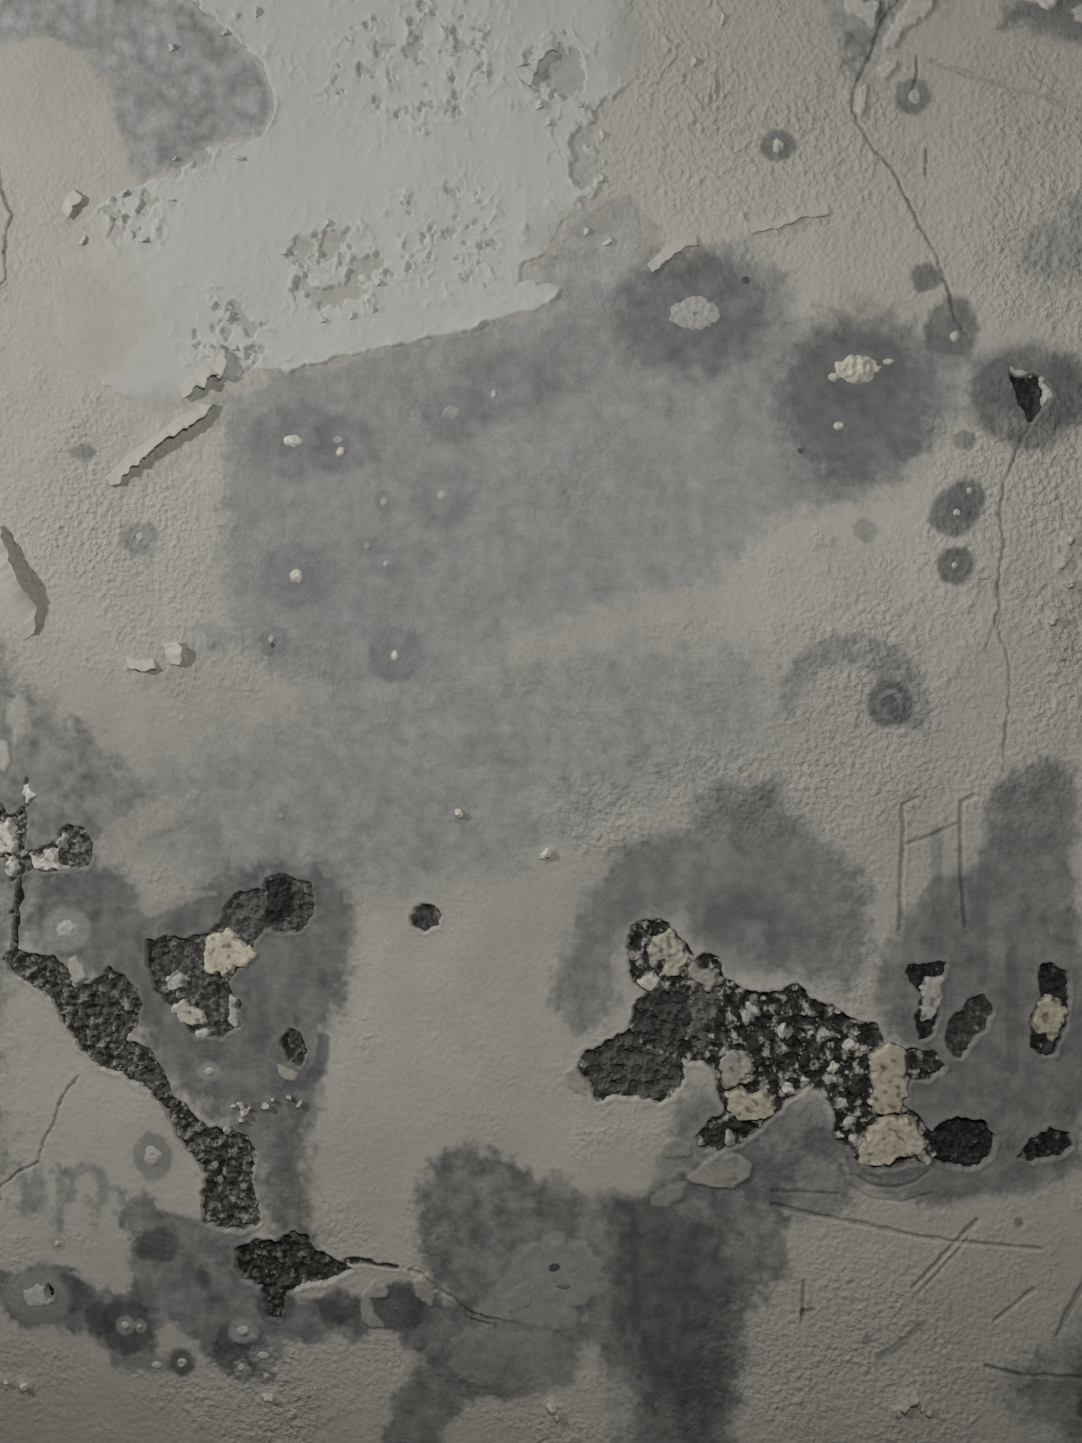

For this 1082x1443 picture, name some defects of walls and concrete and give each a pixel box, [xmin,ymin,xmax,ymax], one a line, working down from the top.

water stain [0,0,275,191]
peeling [53,0,652,487]
water stain [758,126,800,165]
crack [849,0,970,337]
water stain [991,0,1082,53]
water stain [179,179,1082,690]
crack [982,423,1033,775]
spalling [0,783,97,888]
crack [0,1074,80,1191]
spalling [0,869,357,1325]
water stain [0,605,1082,1443]
spalling [575,915,1078,1176]